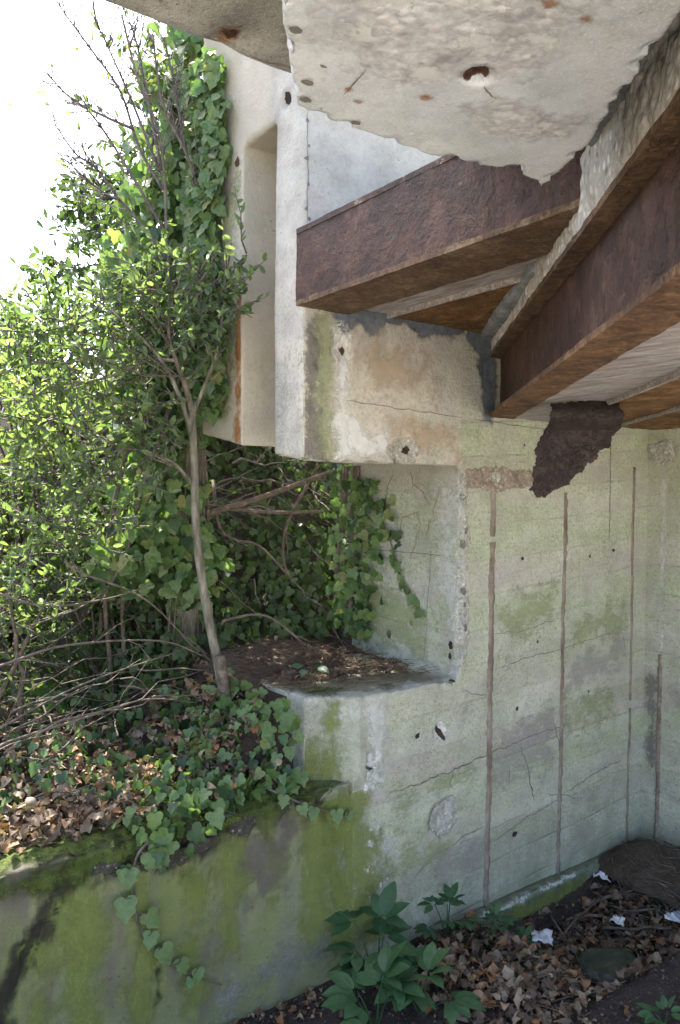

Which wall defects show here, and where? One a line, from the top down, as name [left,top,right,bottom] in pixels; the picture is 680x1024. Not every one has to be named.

spalling [328,0,581,82]
spalling [300,80,322,109]
spalling [386,434,419,463]
water stain [328,310,497,460]
crack [334,398,545,429]
spalling [448,466,534,667]
crack [385,719,578,800]
water stain [90,809,285,876]
water stain [0,877,76,1024]